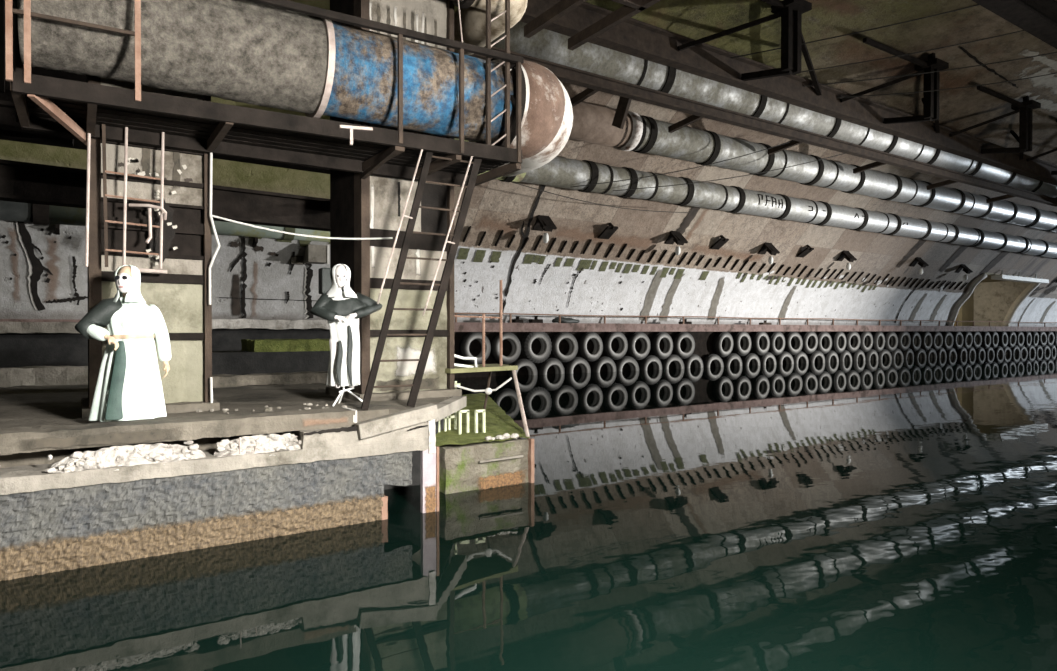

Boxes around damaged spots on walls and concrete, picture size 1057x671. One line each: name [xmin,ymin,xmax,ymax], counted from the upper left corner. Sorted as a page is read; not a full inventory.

leakage [64,236,81,249]
leakage [231,274,241,316]